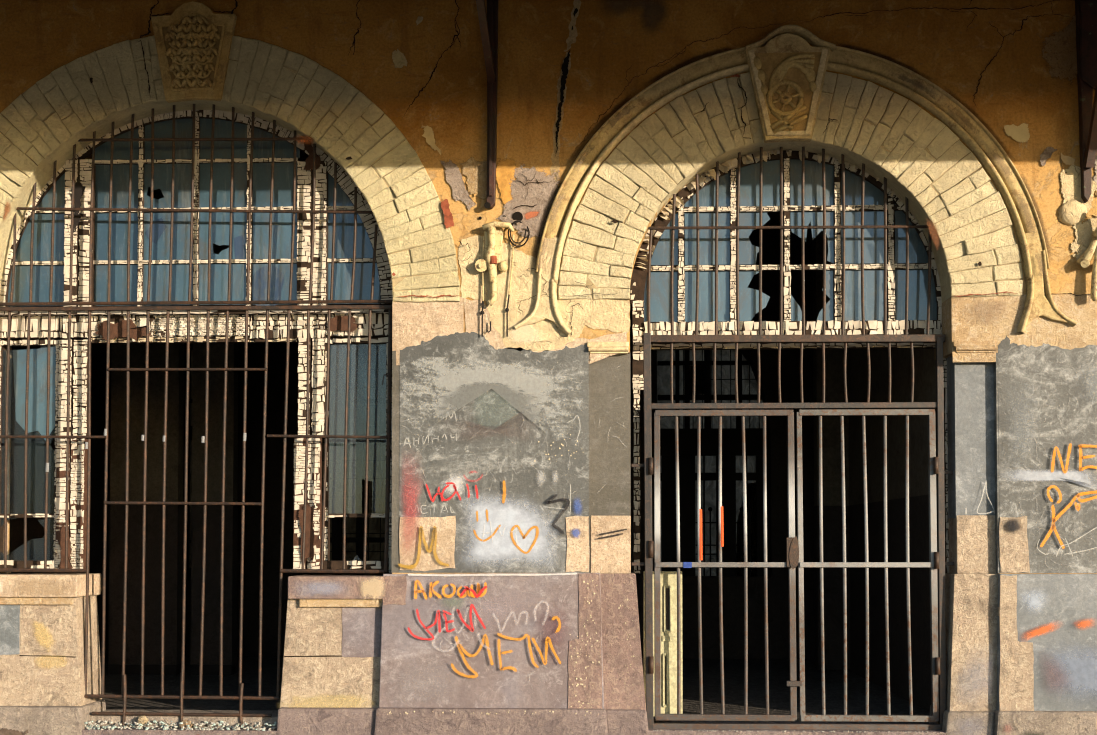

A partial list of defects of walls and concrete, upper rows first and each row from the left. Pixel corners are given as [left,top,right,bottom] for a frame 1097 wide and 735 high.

crack [401,0,461,118]
crack [522,0,1070,199]
peeling [70,177,85,233]
flaking render [421,125,561,238]
peeling [1004,123,1030,143]
peeling [1040,147,1075,166]
peeling [1071,215,1097,265]
peeling [91,319,152,342]
peeling [327,314,359,334]